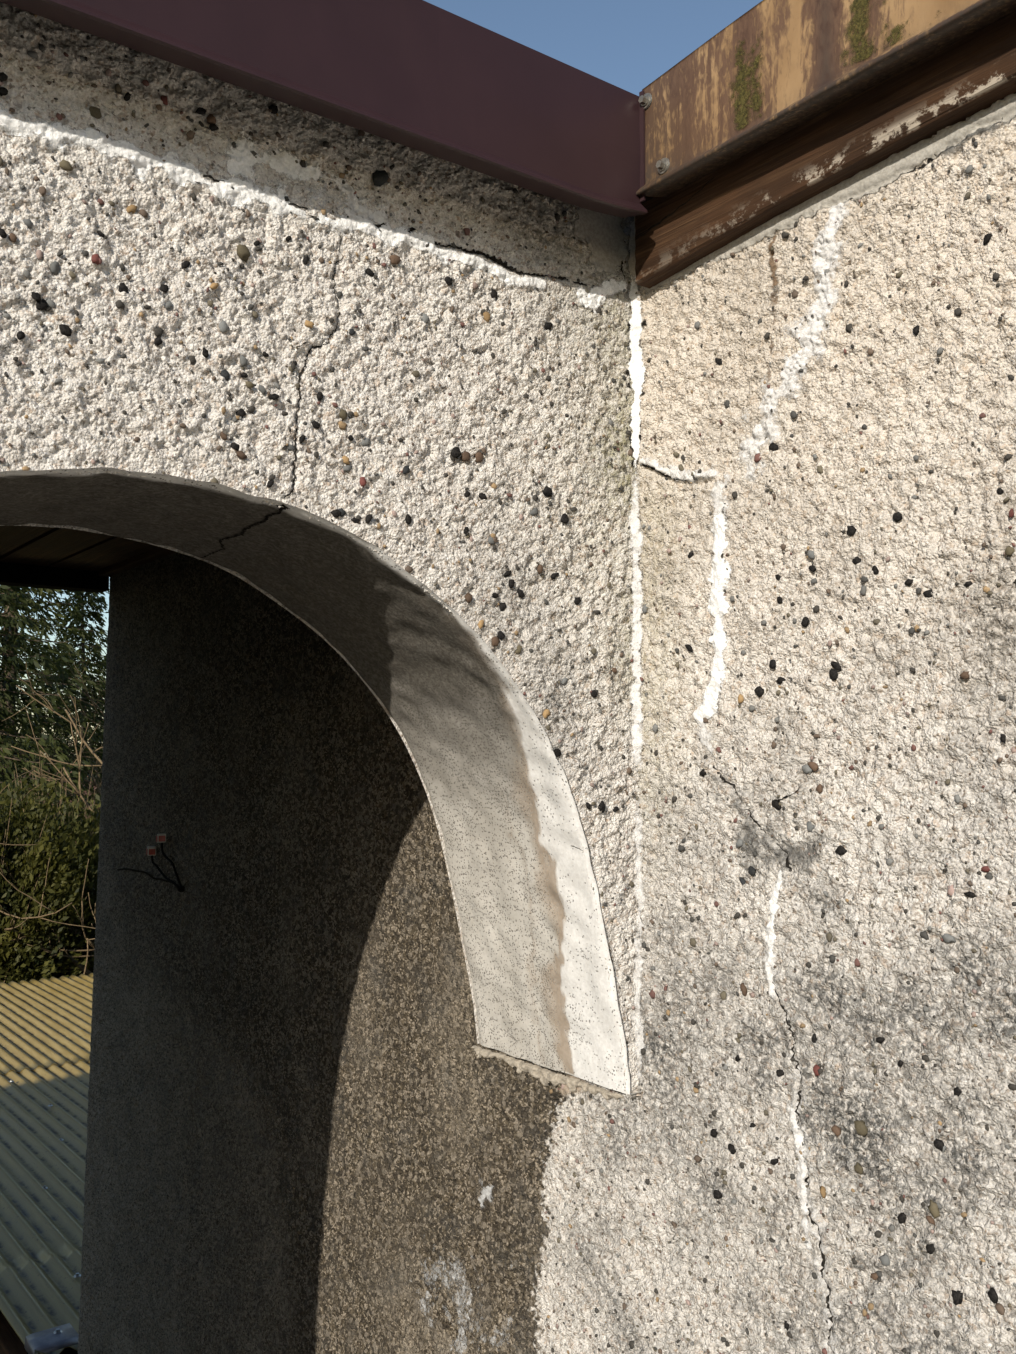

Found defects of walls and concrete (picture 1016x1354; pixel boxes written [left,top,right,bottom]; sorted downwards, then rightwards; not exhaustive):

crack [0,104,629,558]
water stain [411,1248,512,1354]
crack [763,870,838,1354]